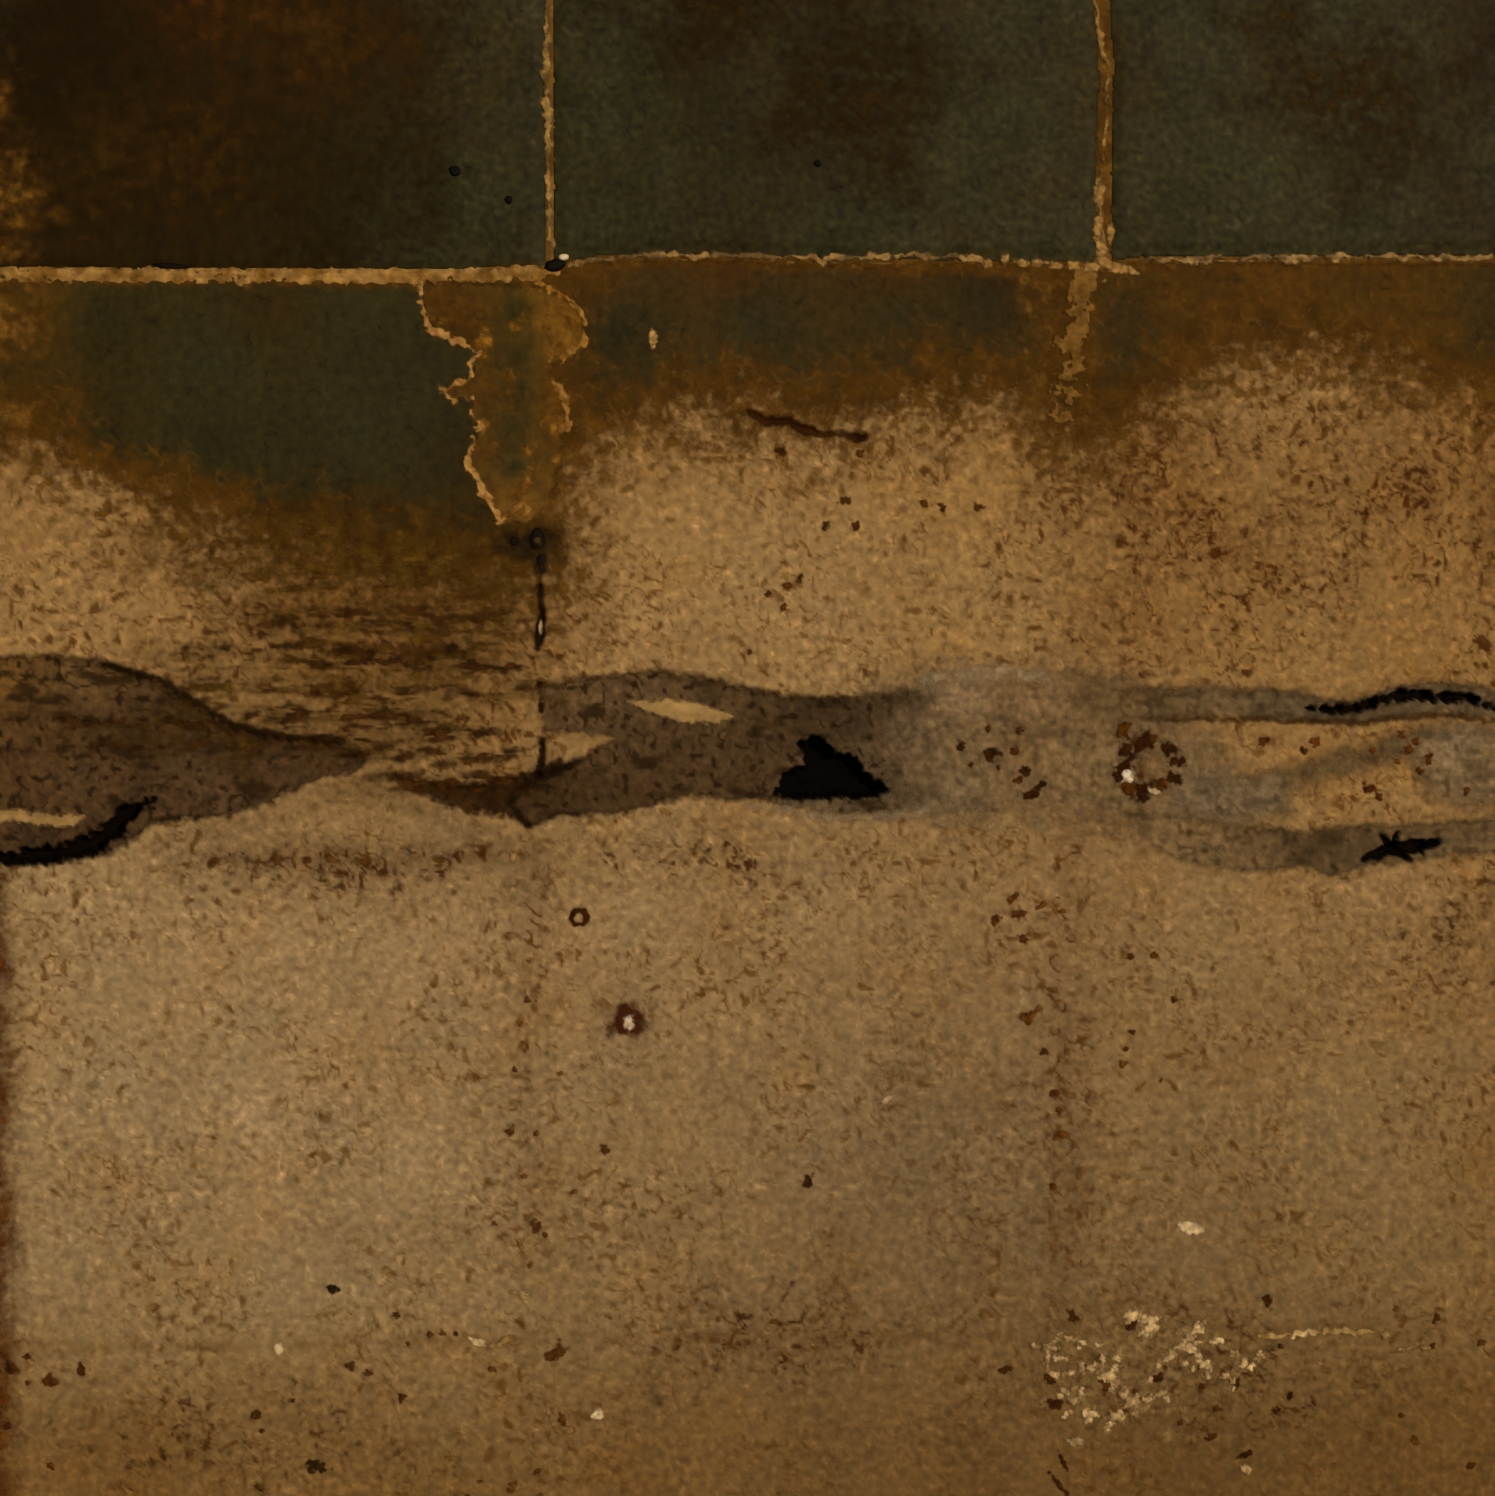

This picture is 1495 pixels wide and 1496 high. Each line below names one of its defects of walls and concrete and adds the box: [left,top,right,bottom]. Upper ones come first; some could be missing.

peeling [417,0,1493,574]
crack [747,409,867,443]
corrosion [837,497,860,531]
corrosion [1104,413,1261,581]
corrosion [765,574,803,611]
water stain [245,603,526,797]
crack [534,584,546,777]
spalling [387,667,1049,827]
spalling [1119,682,1495,726]
crack [1305,688,1495,714]
crack [1361,831,1440,862]
water stain [1025,1297,1265,1441]